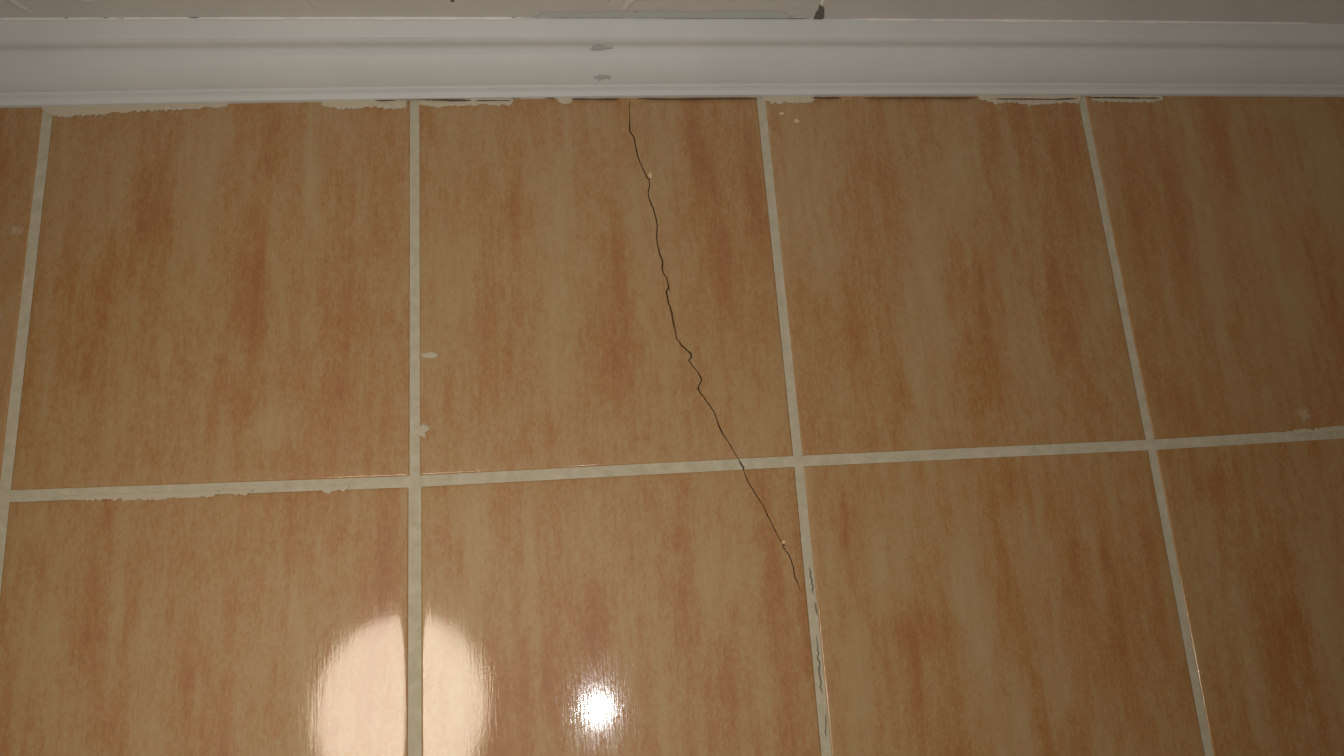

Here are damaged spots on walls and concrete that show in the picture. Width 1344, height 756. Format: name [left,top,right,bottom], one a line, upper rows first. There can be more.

crack [629,103,826,735]